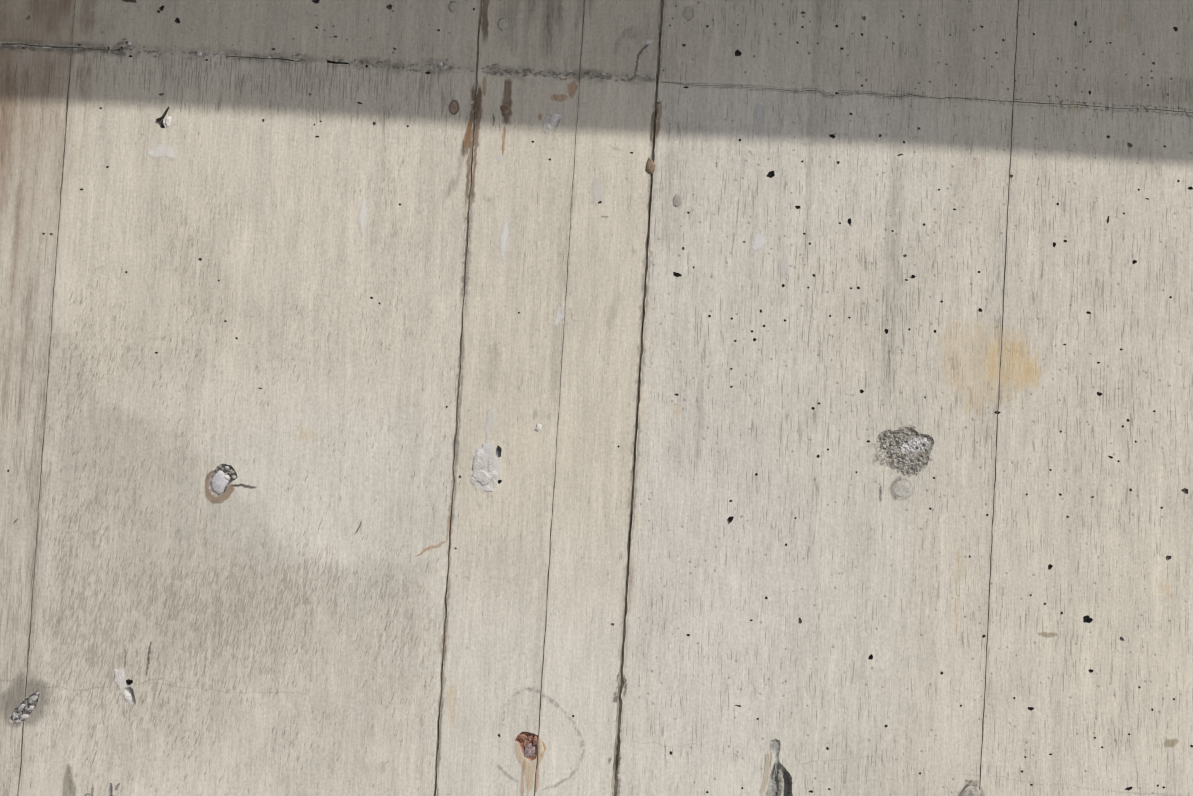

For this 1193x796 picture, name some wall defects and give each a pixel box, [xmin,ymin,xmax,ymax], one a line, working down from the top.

rust [500,80,512,124]
rust [462,87,485,198]
spalling [764,739,793,796]